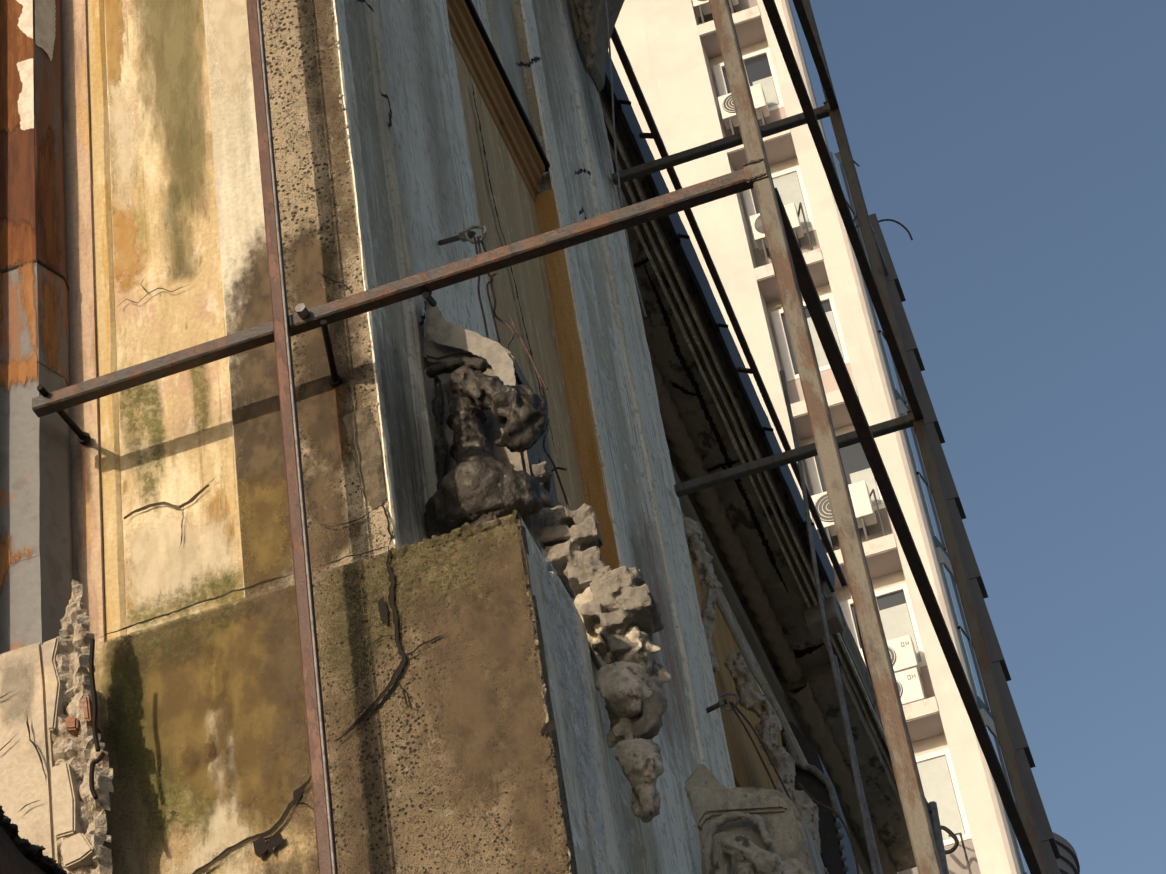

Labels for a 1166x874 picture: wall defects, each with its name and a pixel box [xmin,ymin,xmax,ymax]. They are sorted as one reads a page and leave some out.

peeling [16,59,34,130]
corrosion [0,0,62,390]
peeling [17,0,56,61]
spalling [0,579,114,874]
crack [123,477,216,548]
crack [99,573,294,638]
leakage [102,476,319,874]
crack [192,776,311,874]
crack [318,503,444,741]
spalling [530,461,664,874]